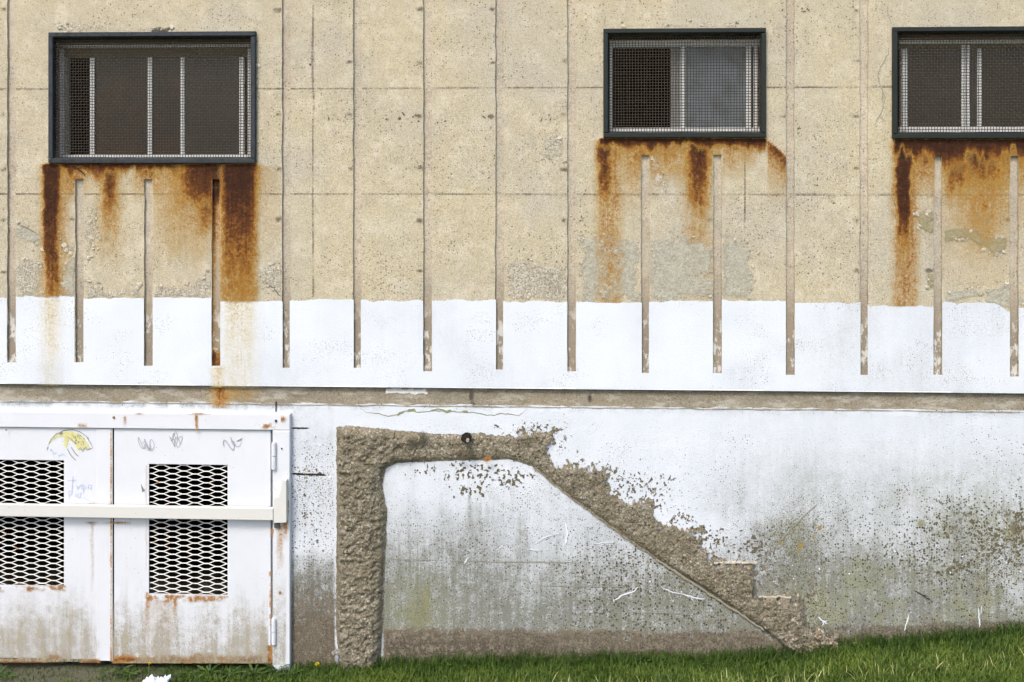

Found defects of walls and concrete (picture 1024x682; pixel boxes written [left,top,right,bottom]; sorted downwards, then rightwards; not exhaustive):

rust [595,138,786,302]
rust [892,139,1024,306]
rust [41,163,261,430]
crack [362,408,526,417]
rust [81,619,273,664]
rust [146,593,228,626]
water stain [385,587,764,666]
water stain [811,620,1024,646]